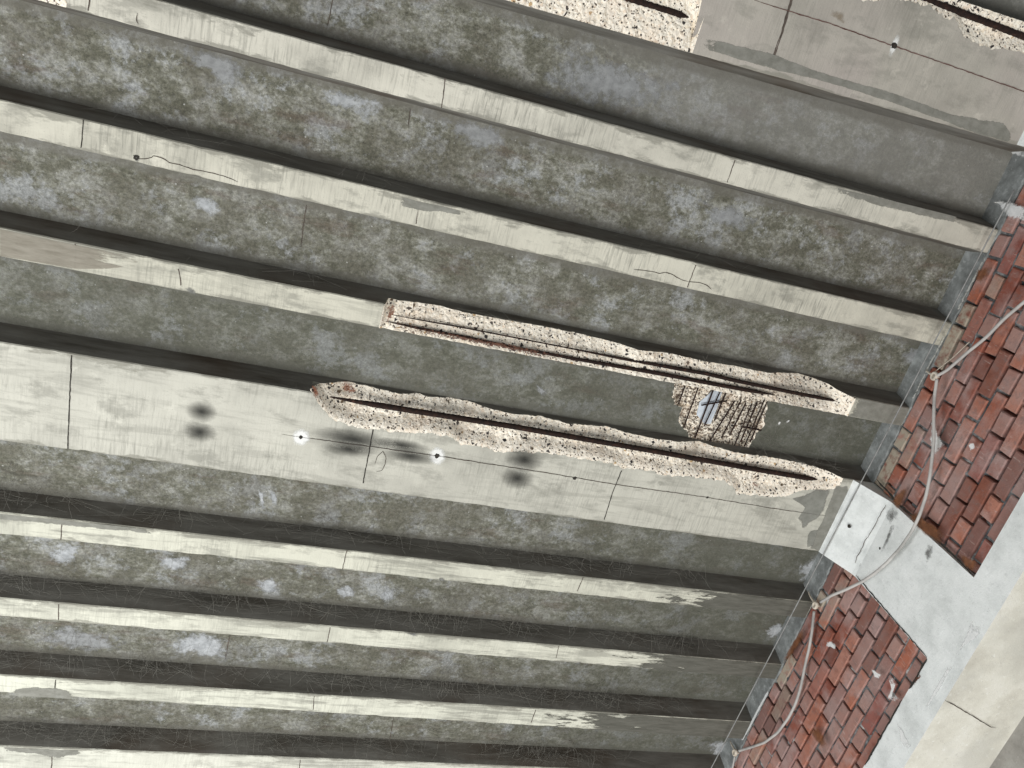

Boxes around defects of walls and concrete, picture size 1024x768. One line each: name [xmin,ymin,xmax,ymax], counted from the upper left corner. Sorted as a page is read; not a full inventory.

spalling [508,0,704,53]
spalling [904,0,1024,53]
crack [133,155,237,182]
spalling [310,298,856,497]